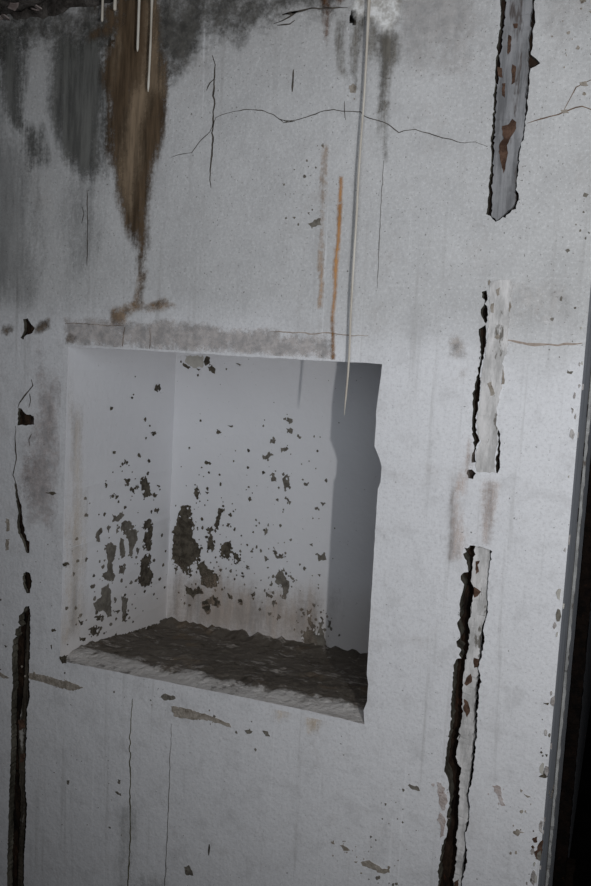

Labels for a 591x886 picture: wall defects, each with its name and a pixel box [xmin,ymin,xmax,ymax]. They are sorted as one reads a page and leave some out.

spalling [0,0,113,20]
rust [497,64,516,97]
water stain [0,0,291,274]
crack [173,55,487,186]
rust [499,119,516,173]
rust [331,178,342,359]
spalling [20,409,34,425]
spalling [5,496,30,552]
peeling [65,451,321,641]
peeling [294,604,340,647]
spalling [21,644,83,691]
spalling [513,817,546,885]